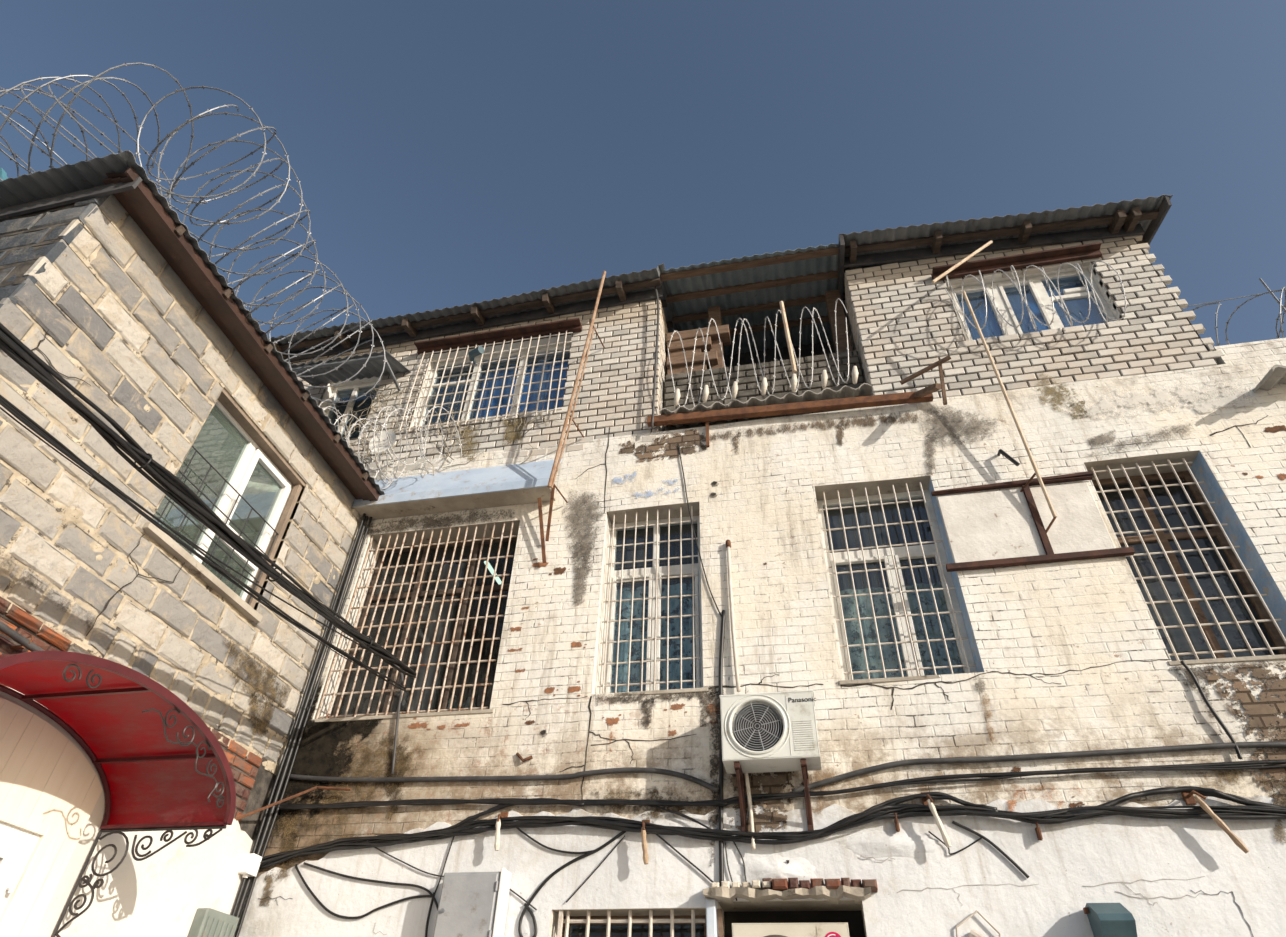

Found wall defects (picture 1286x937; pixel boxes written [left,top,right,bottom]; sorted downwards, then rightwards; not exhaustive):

spalling [619,429,706,462]
spalling [532,558,569,575]
water stain [572,543,591,604]
spalling [544,681,581,696]
crack [708,659,1168,710]
peeling [1187,662,1286,804]
water stain [387,746,408,819]
peeling [729,771,812,832]
crack [1082,876,1254,937]